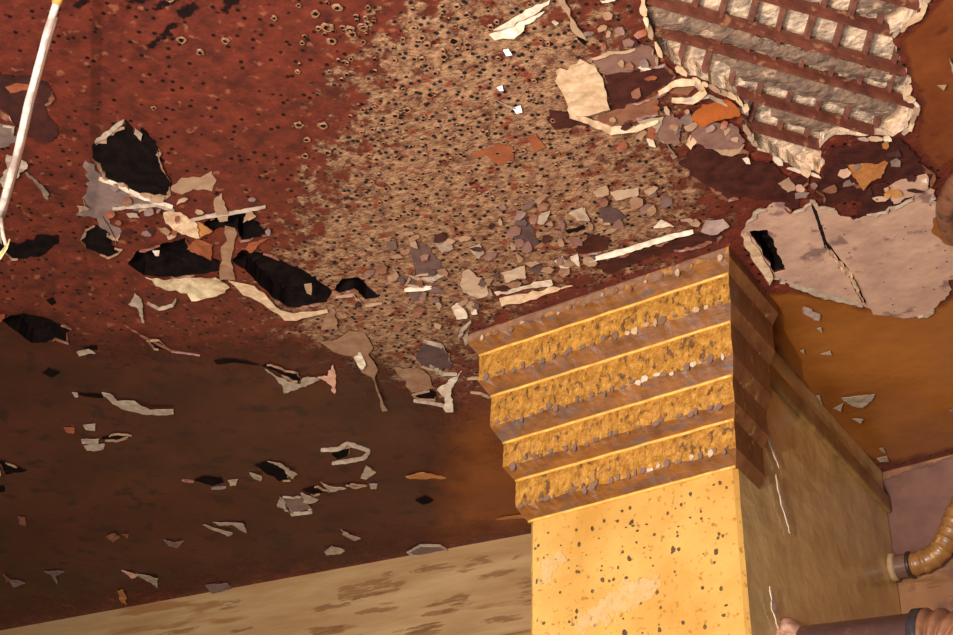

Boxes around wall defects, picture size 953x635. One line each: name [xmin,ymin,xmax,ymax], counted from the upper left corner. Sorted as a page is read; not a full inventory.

peeling [0,73,59,200]
flaking render [489,0,953,319]
peeling [0,232,59,261]
peeling [76,119,730,370]
crack [811,204,866,305]
spalling [0,313,97,356]
peeling [64,424,132,451]
peeling [72,392,174,415]
peeling [250,461,297,482]
peeling [214,358,336,394]
peeling [277,442,377,516]
peeling [394,302,722,412]